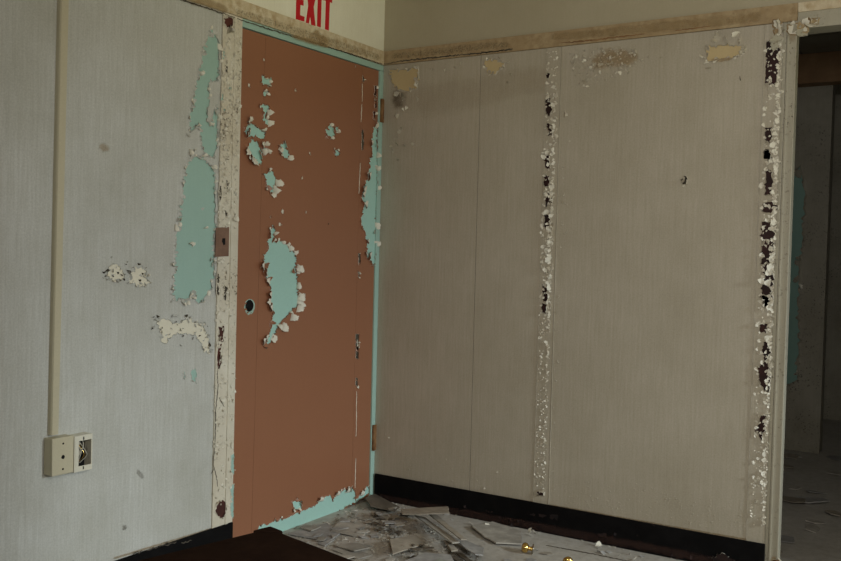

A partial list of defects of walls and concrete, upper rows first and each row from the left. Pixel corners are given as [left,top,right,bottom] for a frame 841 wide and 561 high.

peeling [360,122,382,267]
peeling [102,256,151,288]
peeling [151,15,294,520]
peeling [261,209,306,349]
peeling [534,51,559,496]
peeling [750,17,820,526]
peeling [257,485,370,532]
peeling [379,494,735,561]